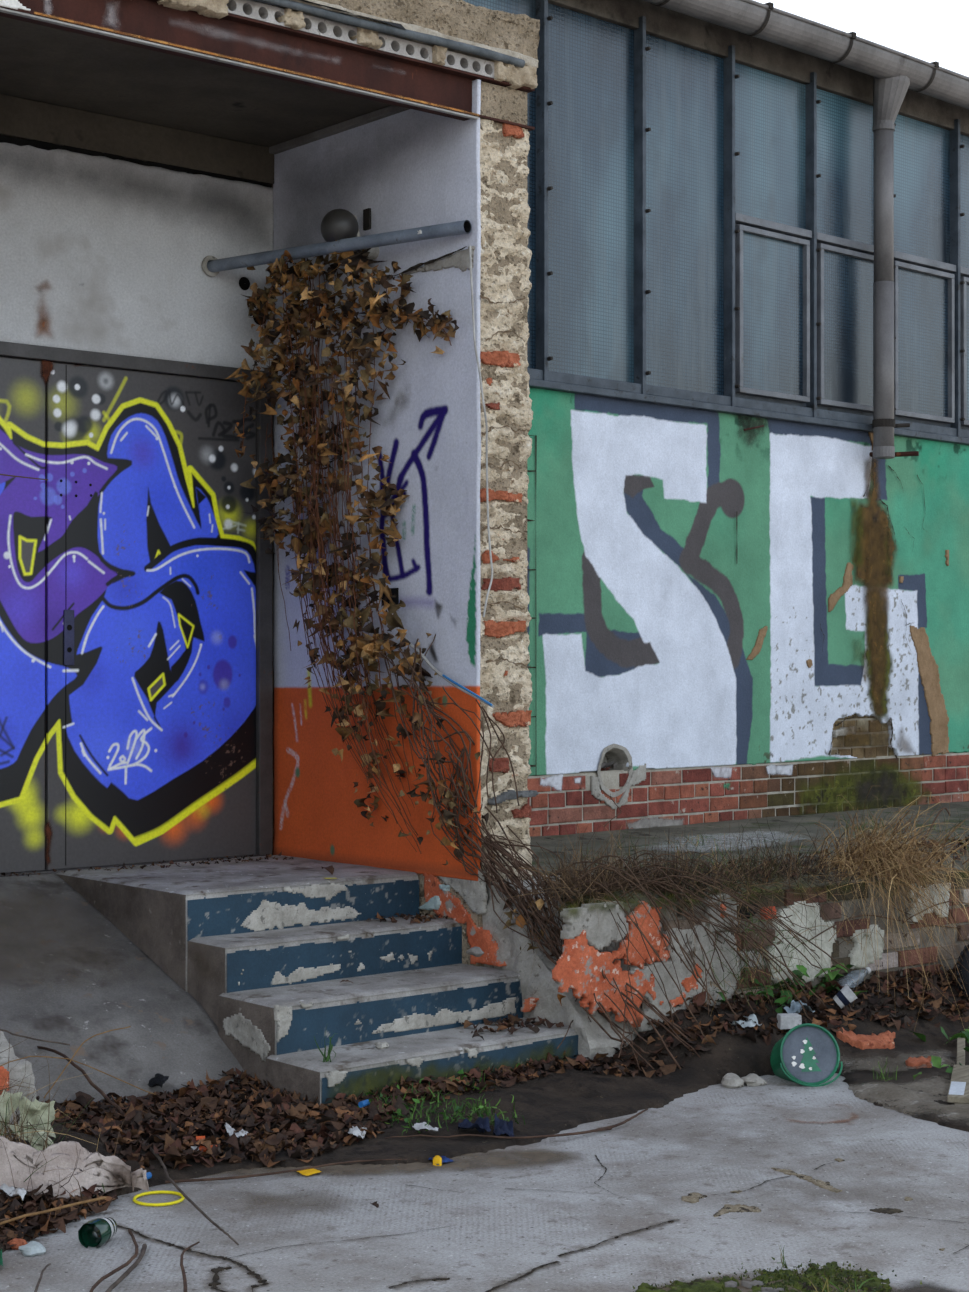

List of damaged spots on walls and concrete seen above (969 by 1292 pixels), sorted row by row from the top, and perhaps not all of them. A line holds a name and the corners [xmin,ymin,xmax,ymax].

flaking render [0,0,31,11]
rust [34,0,113,31]
rust [138,36,218,55]
flaking render [480,351,521,386]
peeling [910,626,949,756]
flaking render [831,708,894,760]
peeling [241,883,365,985]
peeling [355,869,884,1060]
spalling [223,1001,314,1062]
crack [505,1155,625,1198]
crack [117,1225,455,1292]
crack [389,1219,680,1292]